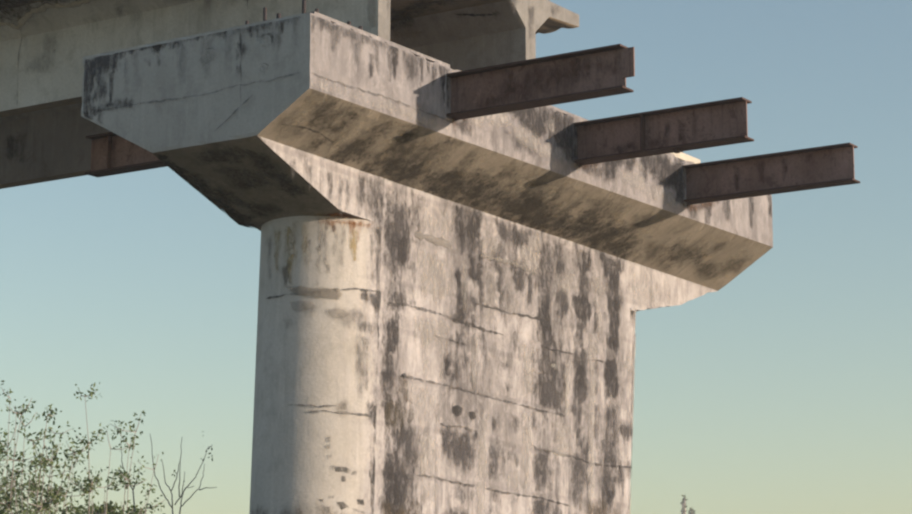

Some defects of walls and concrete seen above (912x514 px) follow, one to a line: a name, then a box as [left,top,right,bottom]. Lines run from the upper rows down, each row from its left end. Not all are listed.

water stain [83,41,179,120]
rust [322,213,368,260]
water stain [284,99,742,514]